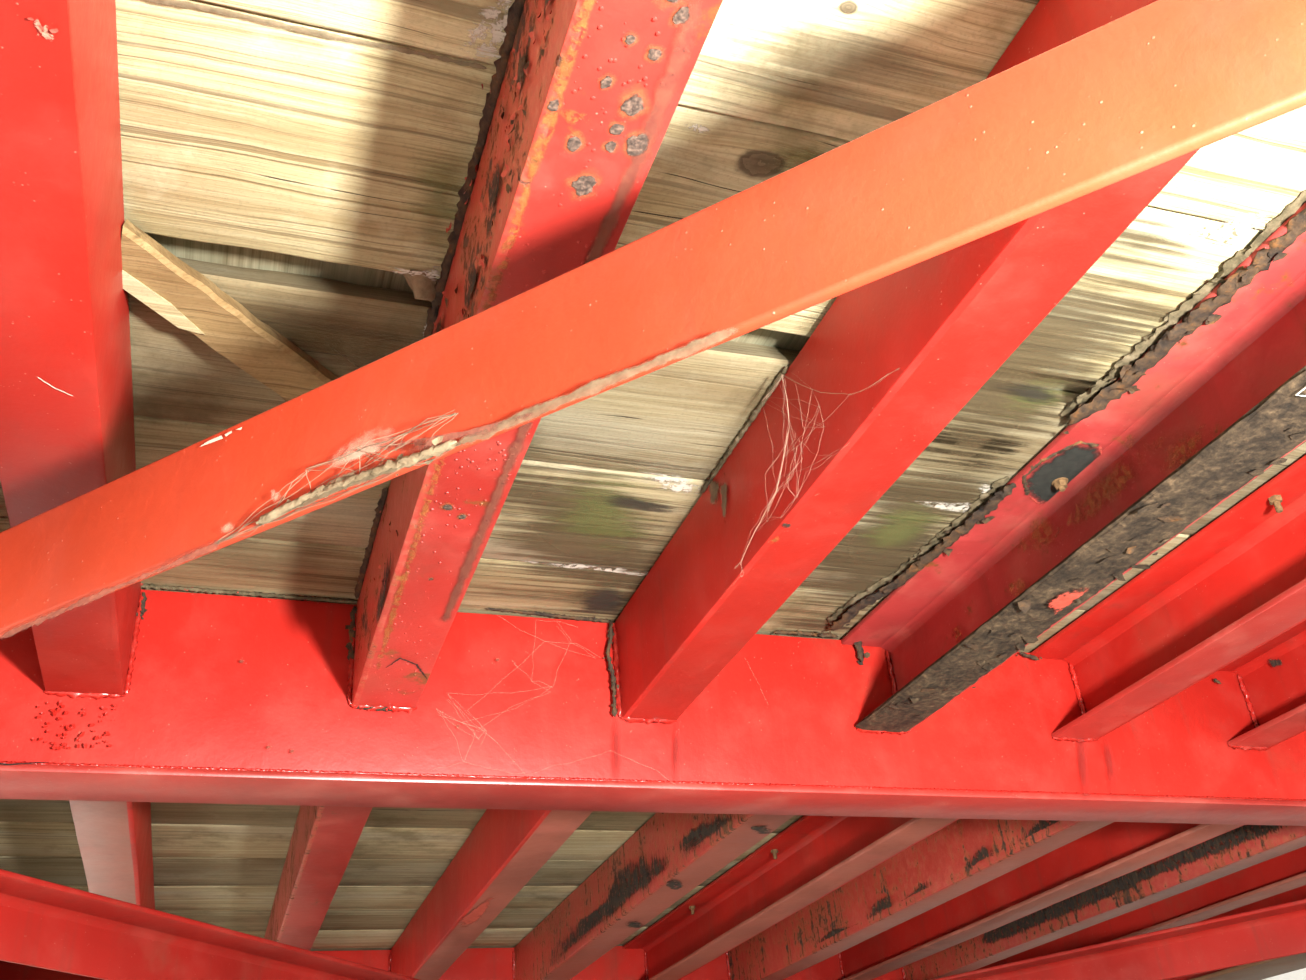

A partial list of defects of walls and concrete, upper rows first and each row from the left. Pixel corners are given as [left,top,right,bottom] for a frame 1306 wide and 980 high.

corrosion [424,0,526,338]
corrosion [567,136,582,152]
corrosion [572,175,598,198]
corrosion [585,0,700,263]
corrosion [1063,208,1306,434]
corrosion [392,414,532,620]
peeling [372,551,391,623]
corrosion [550,816,735,966]
corrosion [817,883,931,944]
corrosion [967,846,993,868]
corrosion [1014,820,1058,845]
corrosion [982,825,1287,944]